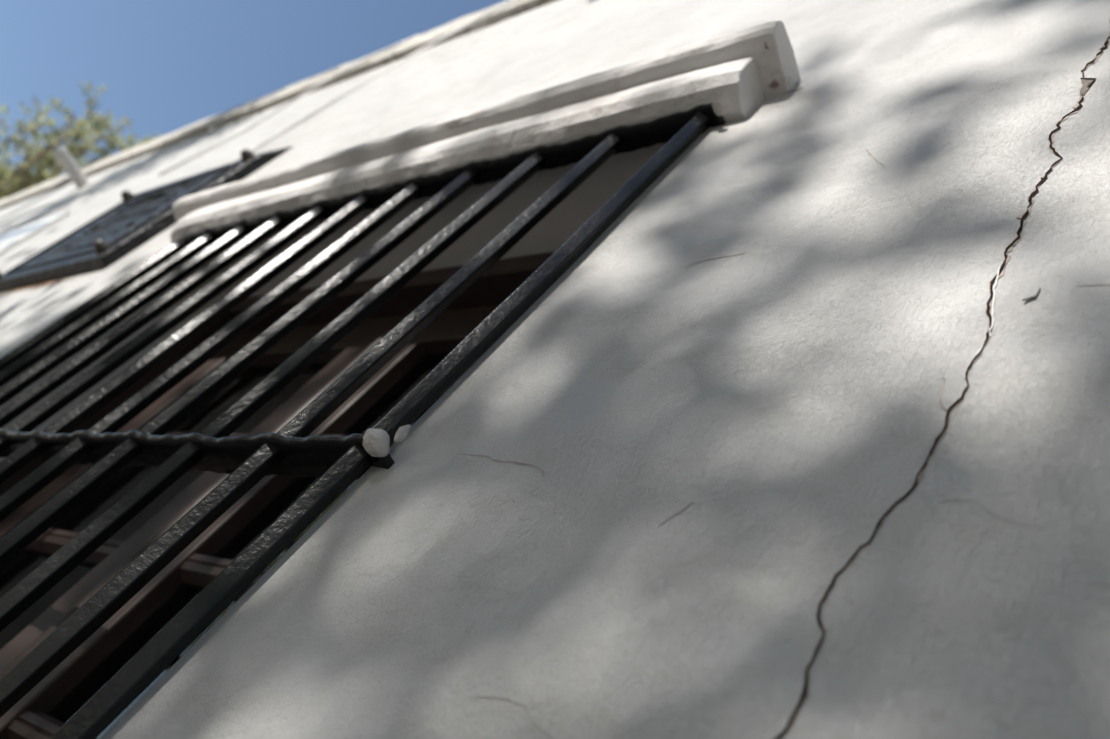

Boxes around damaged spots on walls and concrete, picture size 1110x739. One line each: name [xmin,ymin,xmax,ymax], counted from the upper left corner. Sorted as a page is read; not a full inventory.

crack [774,33,1110,739]